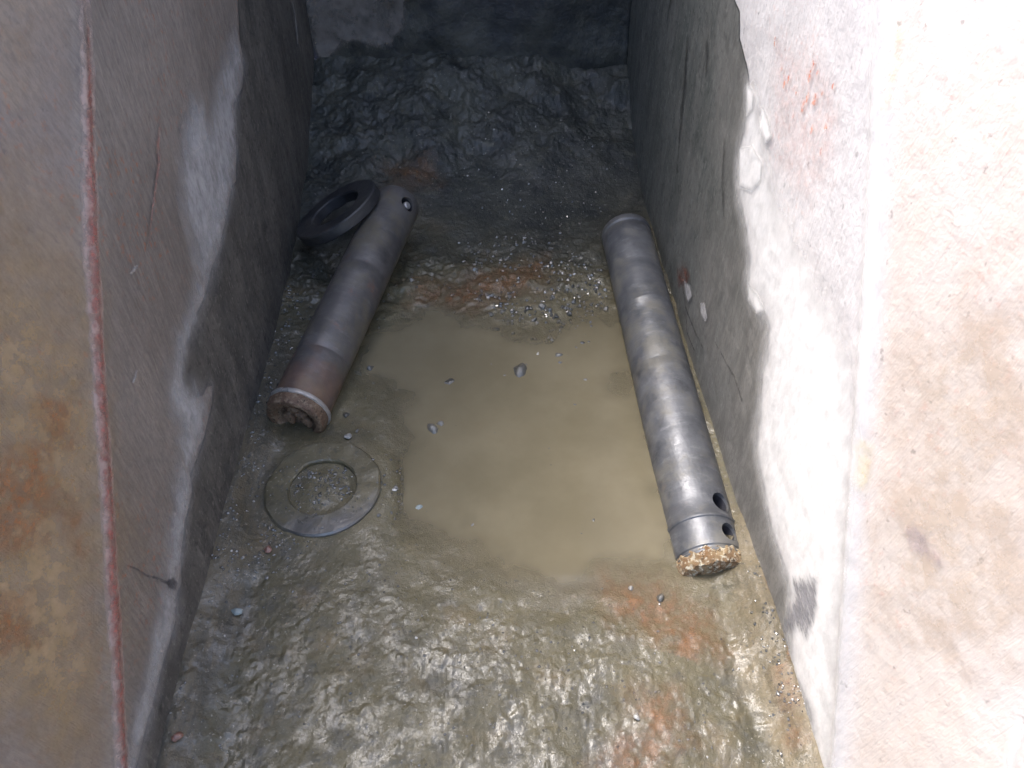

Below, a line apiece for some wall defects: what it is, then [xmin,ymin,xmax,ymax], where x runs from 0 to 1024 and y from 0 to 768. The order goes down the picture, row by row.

rust [79,0,128,768]
crack [131,566,177,589]
damp [627,0,874,768]